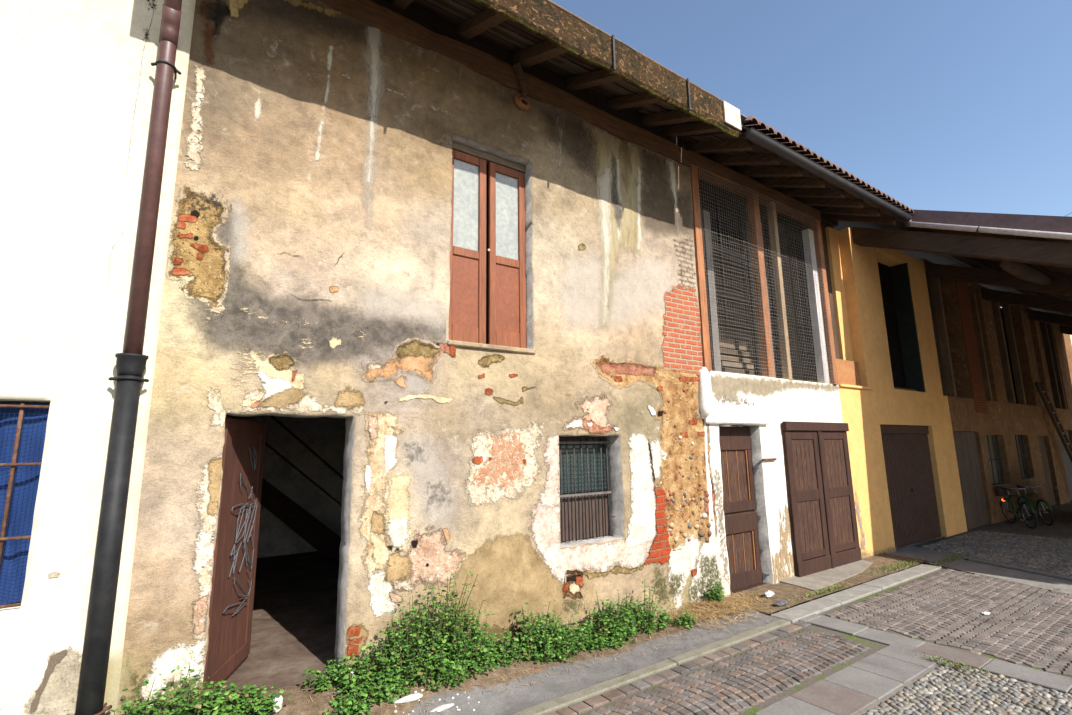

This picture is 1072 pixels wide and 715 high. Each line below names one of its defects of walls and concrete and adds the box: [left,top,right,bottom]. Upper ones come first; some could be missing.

water stain [201,0,231,33]
peeling [228,0,249,18]
peeling [184,65,207,170]
water stain [251,0,383,213]
flaking render [165,184,231,322]
water stain [549,116,689,324]
flaking render [662,239,703,377]
peeling [206,318,467,618]
peeling [465,392,667,602]
peeling [23,645,82,715]
peeling [140,454,222,715]
flaking render [346,623,369,659]